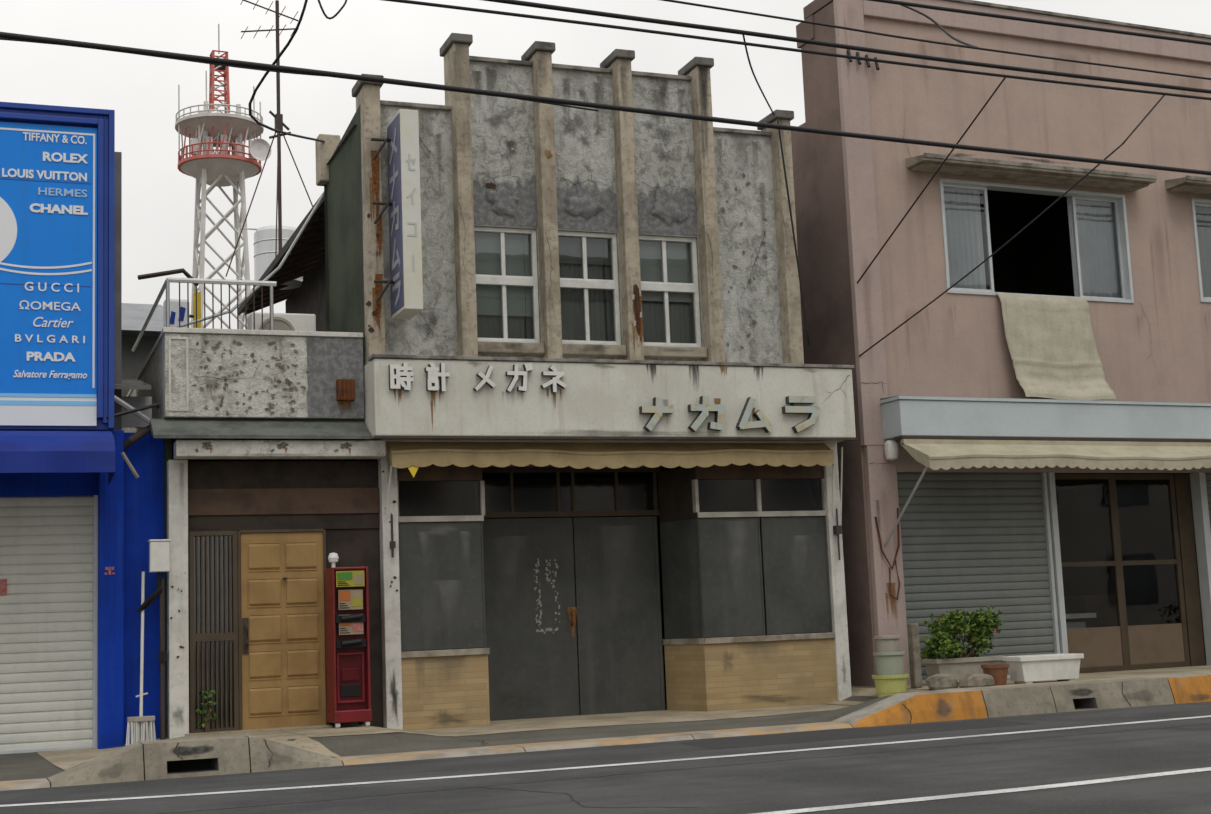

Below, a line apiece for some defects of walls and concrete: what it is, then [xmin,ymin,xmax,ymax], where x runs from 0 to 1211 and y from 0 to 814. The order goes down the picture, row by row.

damp [699,67,707,113]
corrosion [370,150,382,257]
peeling [192,301,380,418]
corrosion [886,583,896,613]